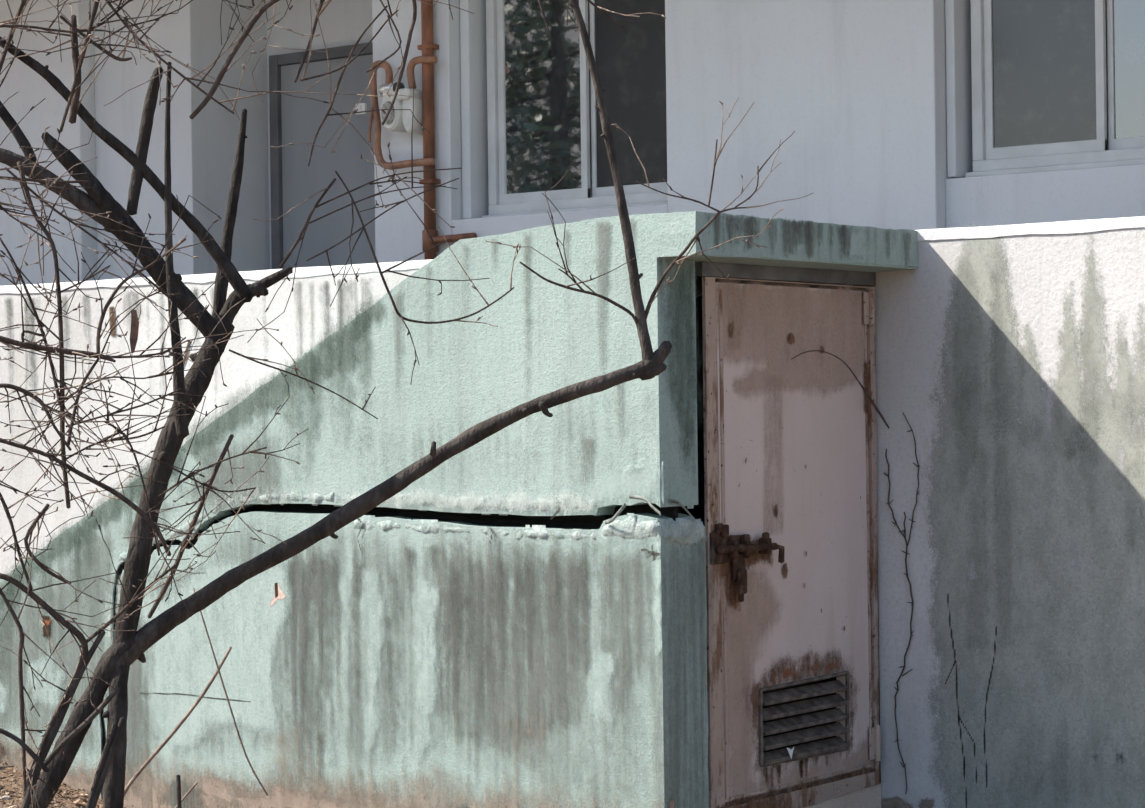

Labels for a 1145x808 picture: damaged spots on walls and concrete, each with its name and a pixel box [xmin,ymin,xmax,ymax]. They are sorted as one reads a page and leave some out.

leakage [171,281,398,475]
leakage [0,462,151,621]
crack [99,698,107,752]
crack [114,562,125,630]
leakage [126,660,146,779]
crack [140,692,251,702]
leakage [279,555,339,778]
crack [151,488,678,554]
leakage [429,547,586,743]
crack [641,545,661,561]
rust [717,538,875,808]
leakage [927,234,1145,808]